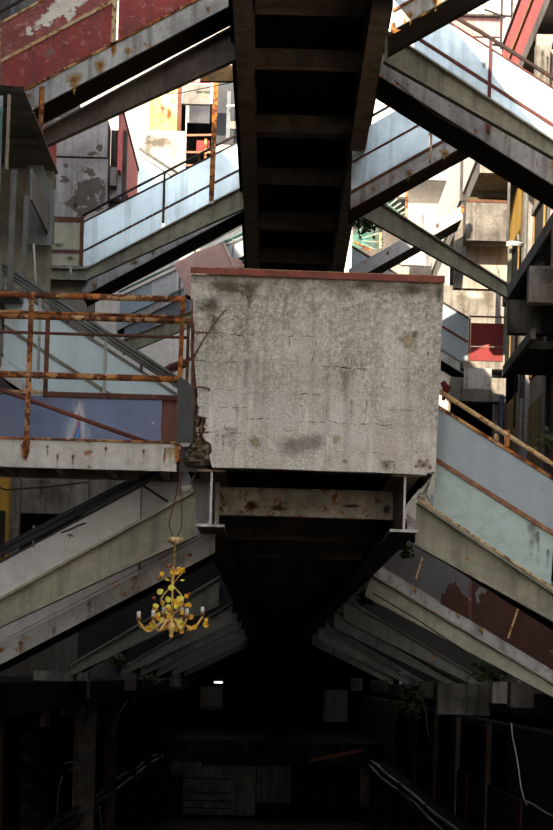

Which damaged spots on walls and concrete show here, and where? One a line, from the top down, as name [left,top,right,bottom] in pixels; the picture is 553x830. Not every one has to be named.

peeling [26,0,88,36]